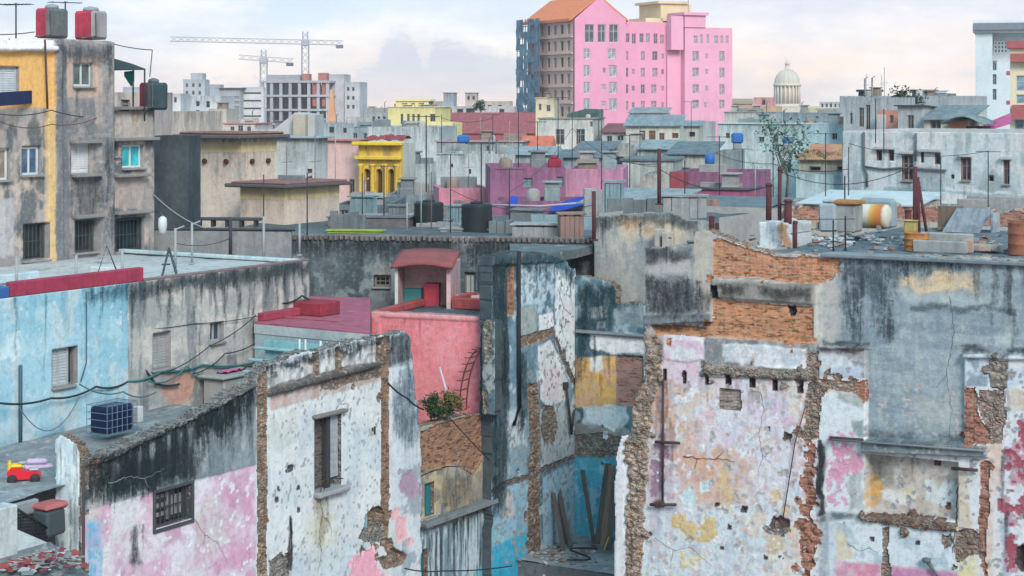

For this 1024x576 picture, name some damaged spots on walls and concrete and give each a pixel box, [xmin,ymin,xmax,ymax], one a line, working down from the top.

damp [62,47,112,75]
damp [85,238,635,517]
flaking render [269,367,483,576]
peeling [494,259,575,563]
flaking render [651,298,817,354]
flaking render [706,238,842,285]
flaking render [642,352,1024,576]
damp [824,258,961,349]
crack [938,296,955,434]
damp [965,344,1024,359]